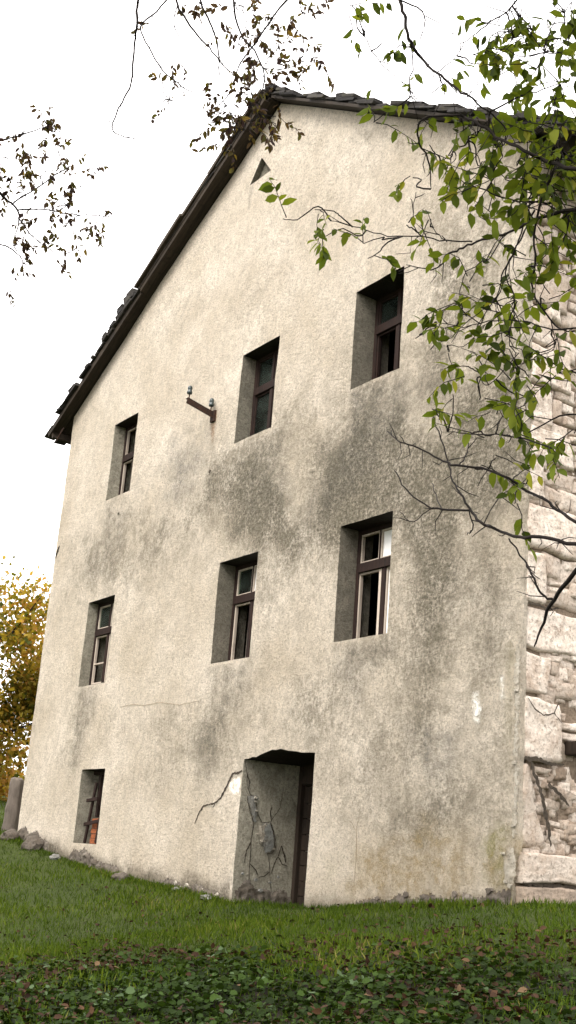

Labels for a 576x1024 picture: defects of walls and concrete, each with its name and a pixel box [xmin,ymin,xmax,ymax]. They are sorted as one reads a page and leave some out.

crack [528,698,562,723]
crack [195,762,287,885]
crack [524,756,569,847]